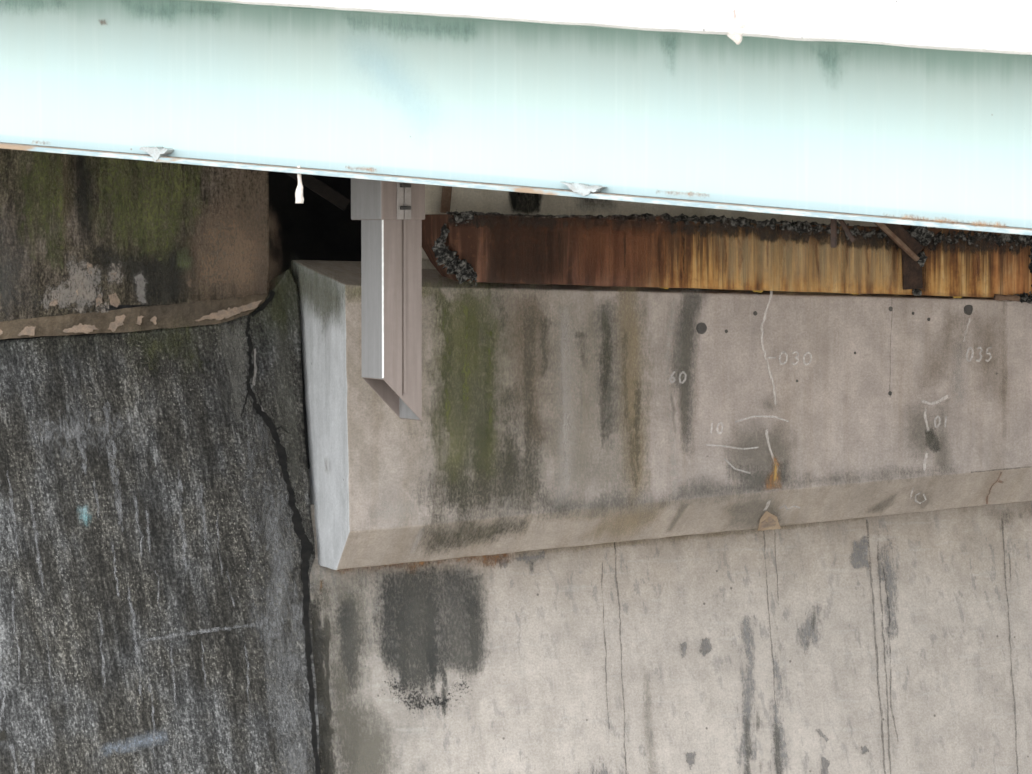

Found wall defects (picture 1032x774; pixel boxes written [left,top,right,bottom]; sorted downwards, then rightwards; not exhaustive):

peeling [17,326,36,336]
peeling [41,256,157,334]
water stain [75,156,198,307]
peeling [194,300,261,321]
crack [760,291,776,405]
water stain [424,305,639,550]
crack [765,431,778,473]
crack [241,290,321,774]
water stain [311,567,487,774]
water stain [737,616,759,774]
water stain [770,656,788,774]
crack [867,528,898,774]